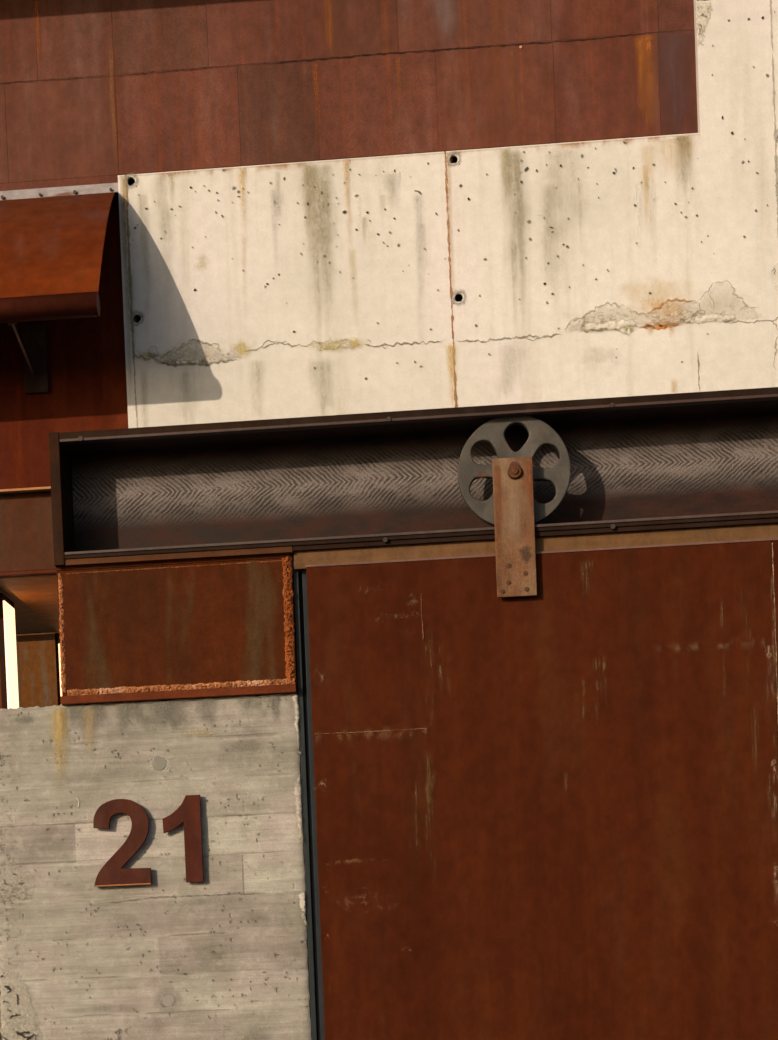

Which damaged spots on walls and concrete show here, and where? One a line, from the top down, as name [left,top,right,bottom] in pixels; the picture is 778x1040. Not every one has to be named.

rust [643,306,678,330]
spalling [565,281,757,335]
crack [134,355,174,365]
spalling [148,339,245,367]
crack [245,340,310,352]
crack [365,334,561,349]